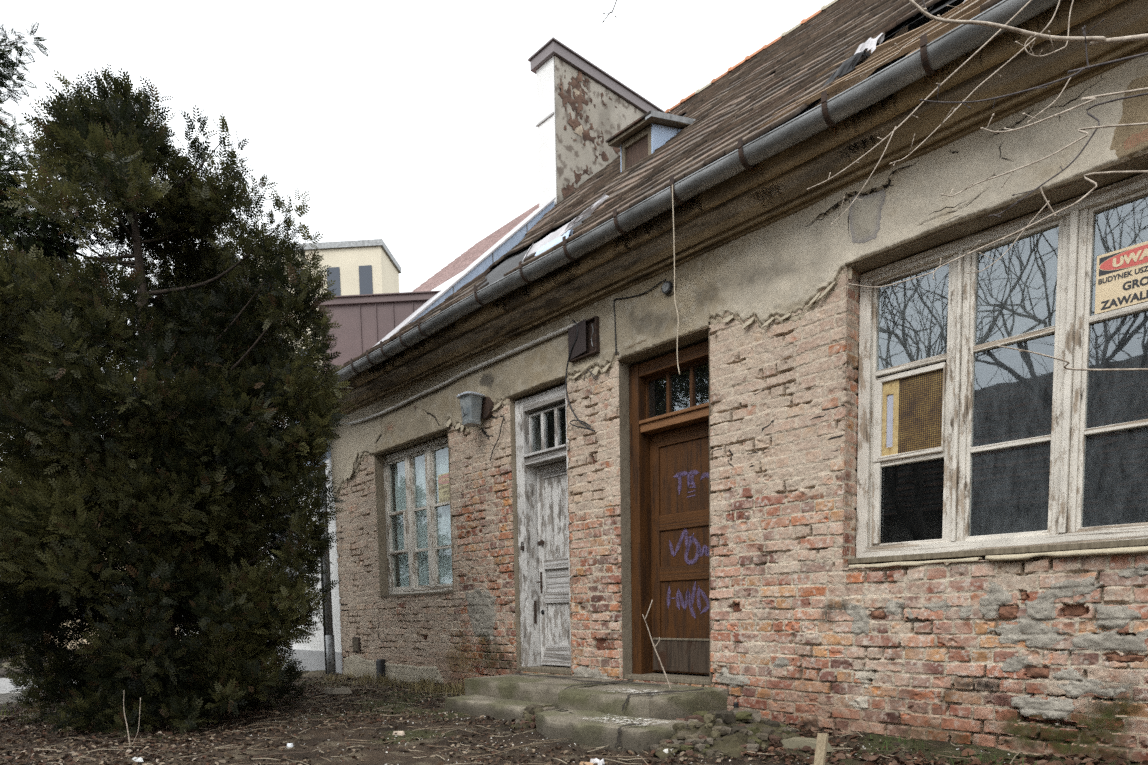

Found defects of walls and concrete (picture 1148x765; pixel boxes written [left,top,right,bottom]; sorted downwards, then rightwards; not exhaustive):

flaking render [558,70,620,197]
crack [805,160,919,233]
peeling [709,263,852,331]
peeling [567,336,659,383]
peeling [446,397,509,436]
peeling [336,451,374,498]
spalling [999,592,1027,619]
spalling [1064,605,1089,616]
spalling [1026,667,1049,678]
spalling [1107,654,1145,662]
spalling [1026,717,1076,725]